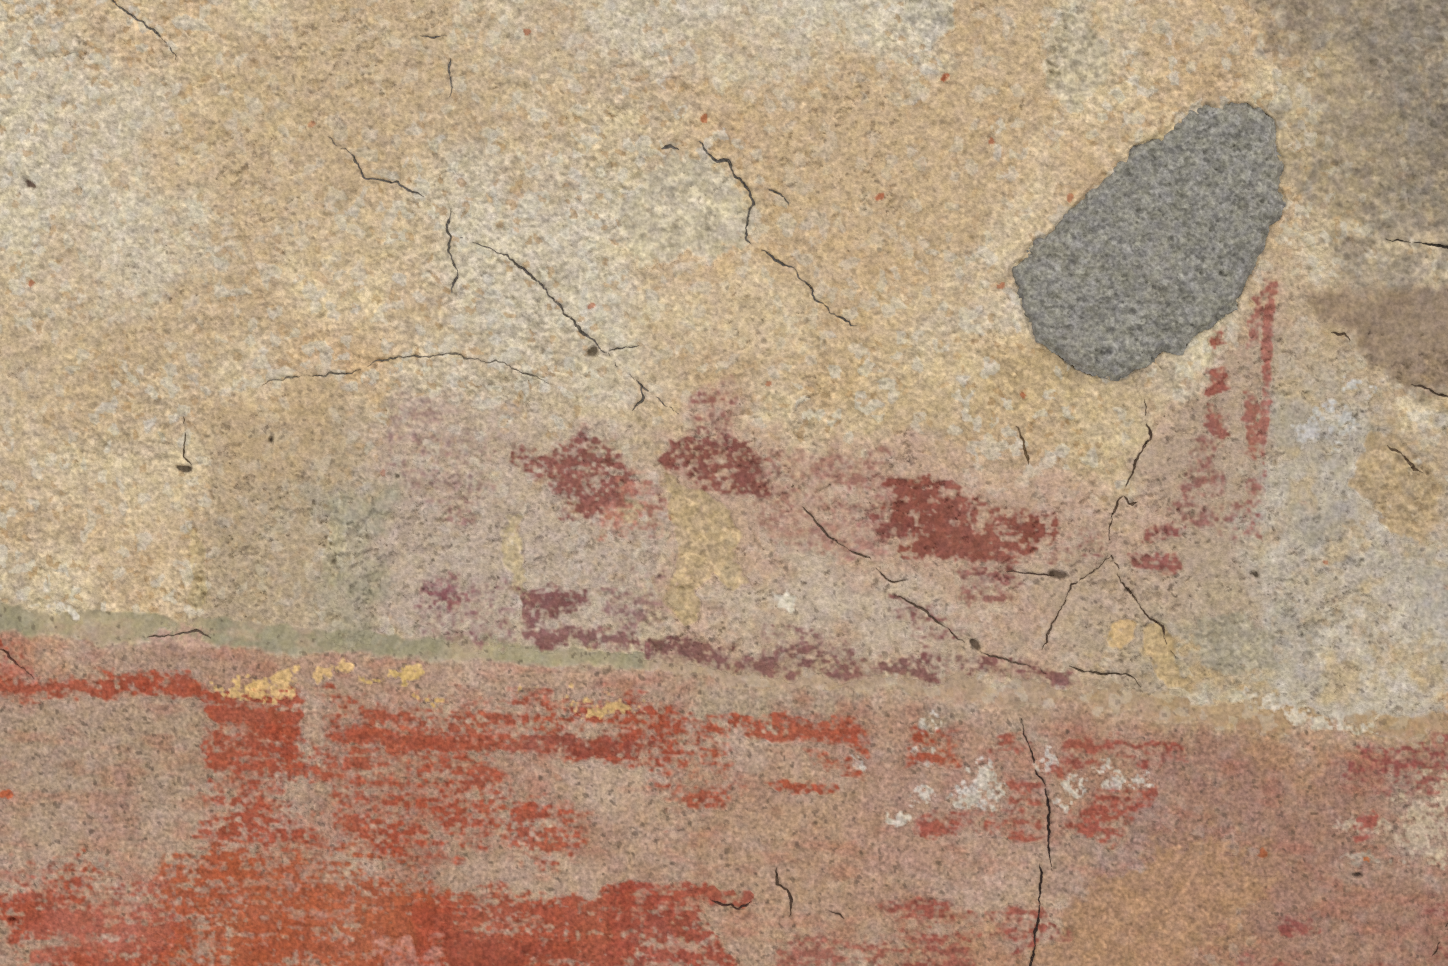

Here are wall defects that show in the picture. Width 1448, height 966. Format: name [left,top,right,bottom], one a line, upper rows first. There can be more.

crack [329,137,679,414]
crack [662,141,857,326]
crack [803,400,1176,687]
peeling [0,634,877,966]
peeling [901,722,966,771]
crack [1021,718,1052,966]
peeling [910,730,1191,852]
peeling [1339,729,1448,845]
peeling [765,894,1076,966]
peeling [1266,906,1328,941]
peeling [1418,888,1448,966]